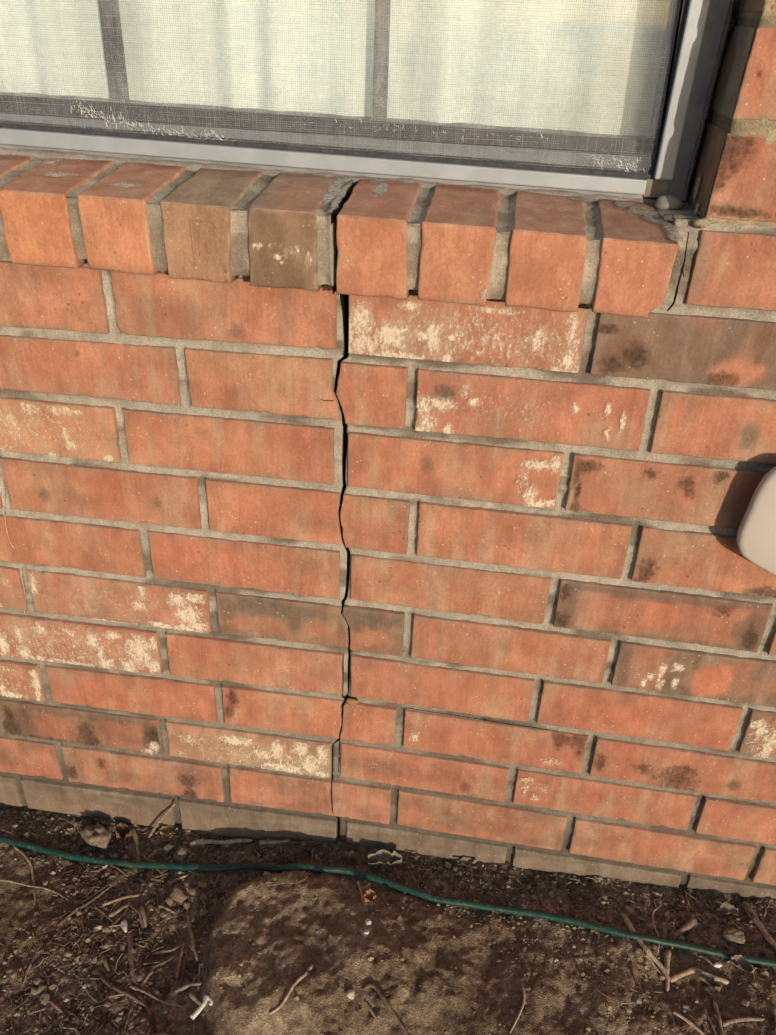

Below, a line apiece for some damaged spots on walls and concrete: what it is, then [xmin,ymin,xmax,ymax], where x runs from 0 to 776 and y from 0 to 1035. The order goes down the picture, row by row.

crack [331,190,348,224]
leakage [349,300,580,373]
leakage [0,402,114,462]
leakage [415,384,500,434]
leakage [604,403,626,441]
leakage [516,455,560,508]
crack [321,283,351,838]
leakage [0,586,208,701]
leakage [180,734,330,778]
leakage [749,718,776,758]